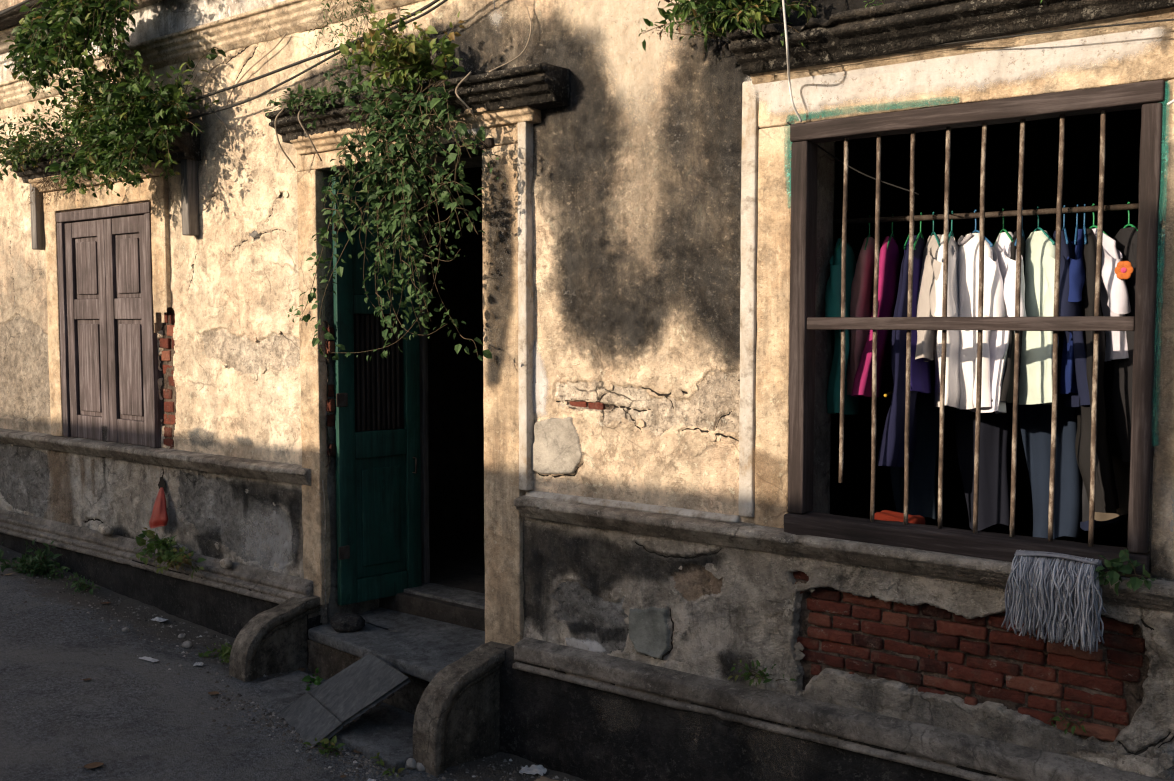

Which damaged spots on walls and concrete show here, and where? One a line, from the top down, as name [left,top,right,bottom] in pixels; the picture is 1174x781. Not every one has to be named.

water stain [281,0,1170,384]
flaking render [159,307,176,449]
flaking render [555,369,740,441]
water stain [113,527,136,540]
water stain [195,529,222,558]
water stain [230,480,302,562]
water stain [522,526,721,632]
water stain [566,622,626,652]
flaking render [793,571,1150,743]